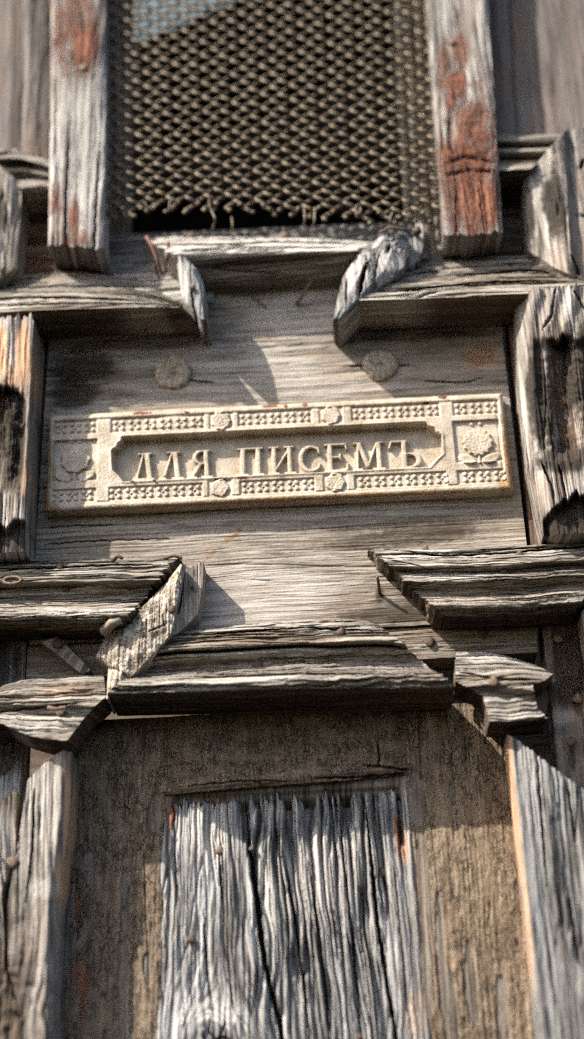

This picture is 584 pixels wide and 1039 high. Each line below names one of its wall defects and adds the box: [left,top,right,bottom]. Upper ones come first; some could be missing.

crack [63,112,71,239]
crack [93,134,101,245]
crack [26,793,35,902]
crack [189,740,407,1039]